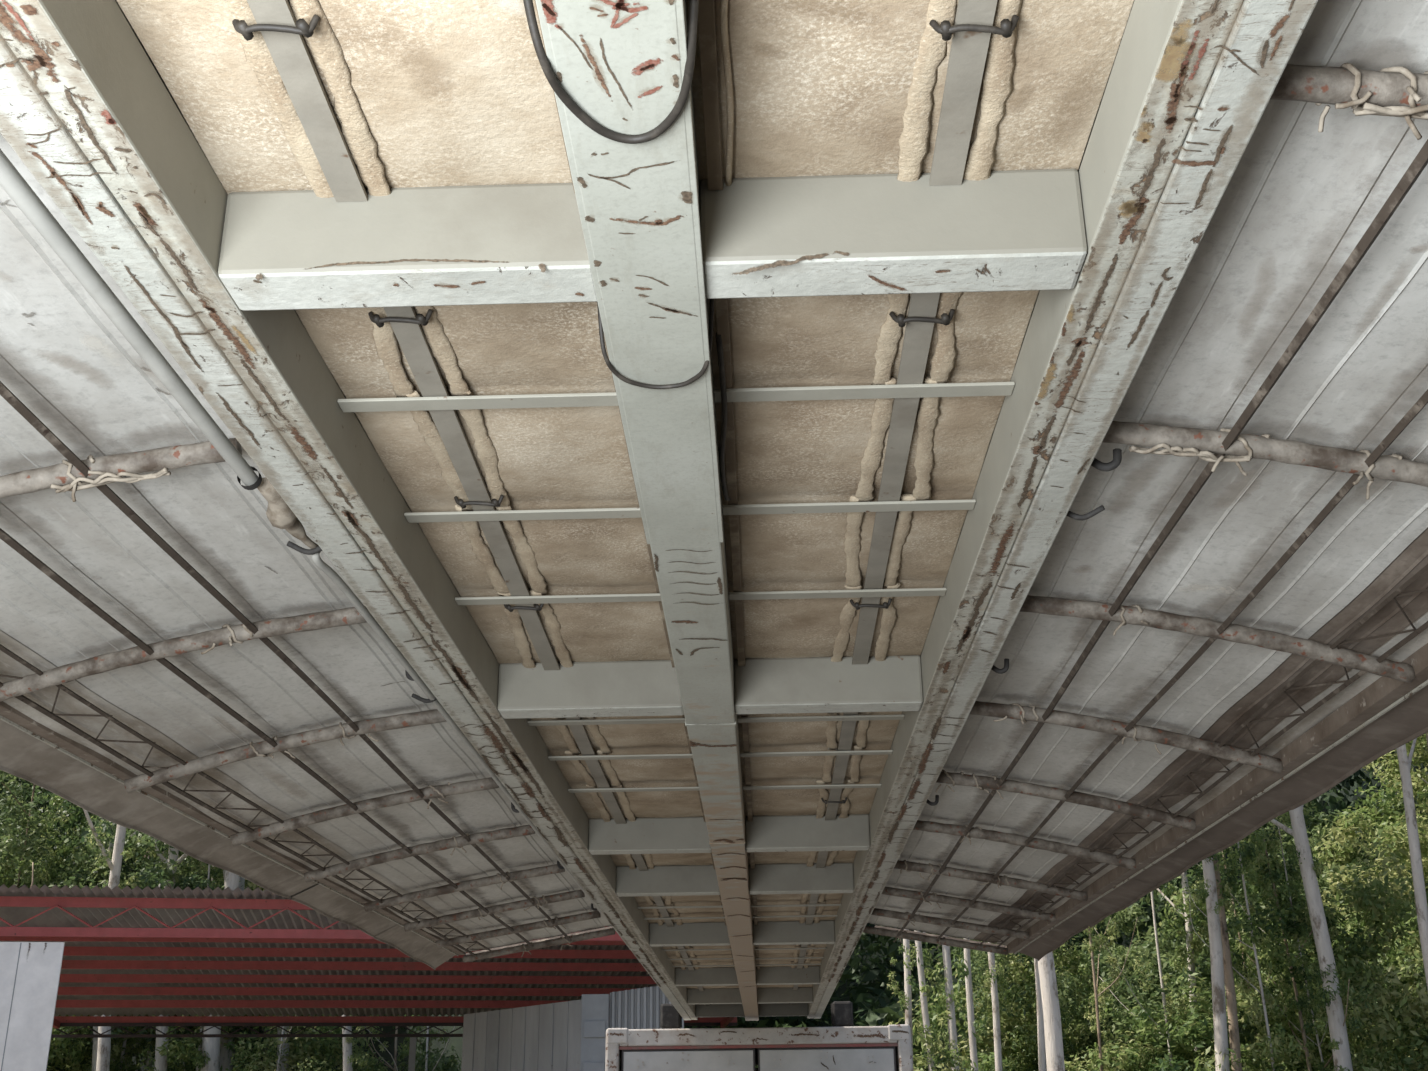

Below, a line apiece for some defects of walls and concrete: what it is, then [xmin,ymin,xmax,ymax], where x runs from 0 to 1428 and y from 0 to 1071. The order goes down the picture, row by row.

rust [541,0,563,30]
crack [558,26,631,121]
rust [590,0,648,28]
peeling [1260,0,1294,68]
peeling [64,89,118,174]
peeling [1195,125,1232,208]
peeling [133,202,156,225]
crack [577,152,697,319]
peeling [124,266,215,372]
peeling [1124,267,1173,348]
crack [654,554,722,605]